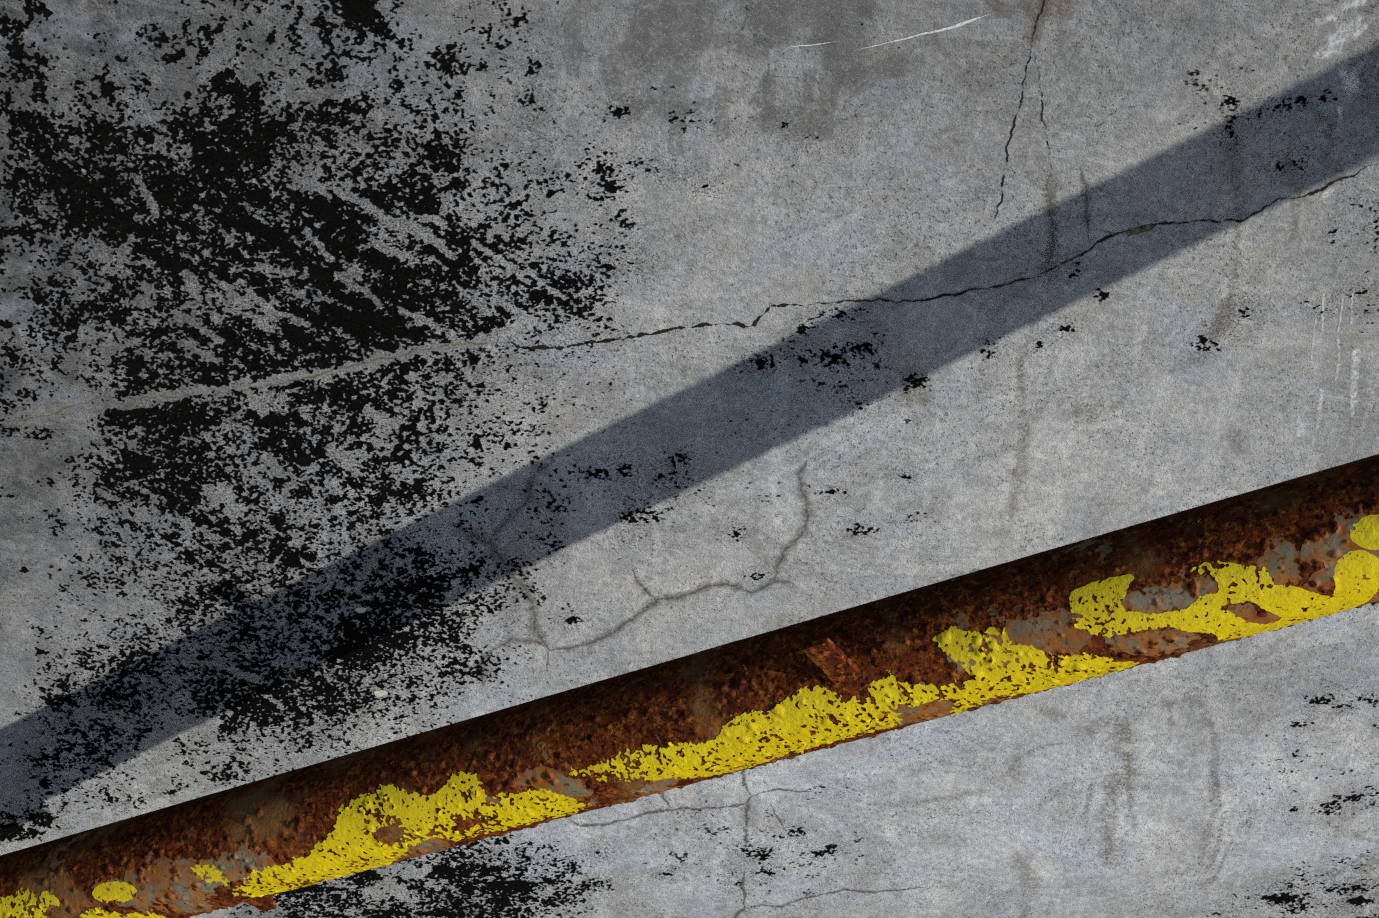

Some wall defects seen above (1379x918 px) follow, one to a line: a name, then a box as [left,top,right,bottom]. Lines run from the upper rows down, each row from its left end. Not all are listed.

crack [456,0,1377,350]
crack [460,460,810,683]
rust [246,896,277,912]